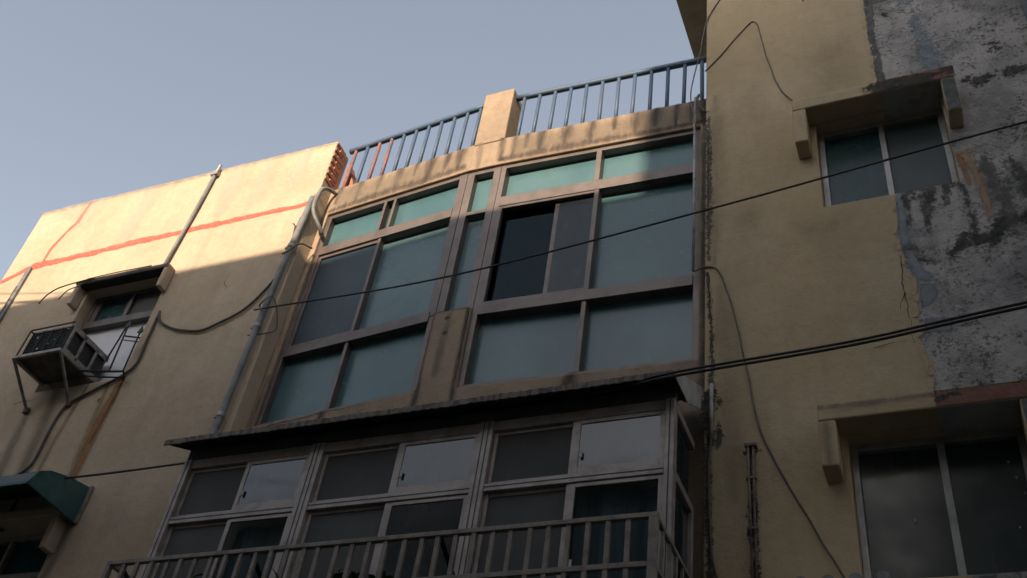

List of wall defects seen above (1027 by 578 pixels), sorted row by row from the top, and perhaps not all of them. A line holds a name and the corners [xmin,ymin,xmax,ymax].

corrosion [69,378,123,479]
damp [498,99,723,578]
crack [874,256,915,348]
peeling [859,0,1027,421]